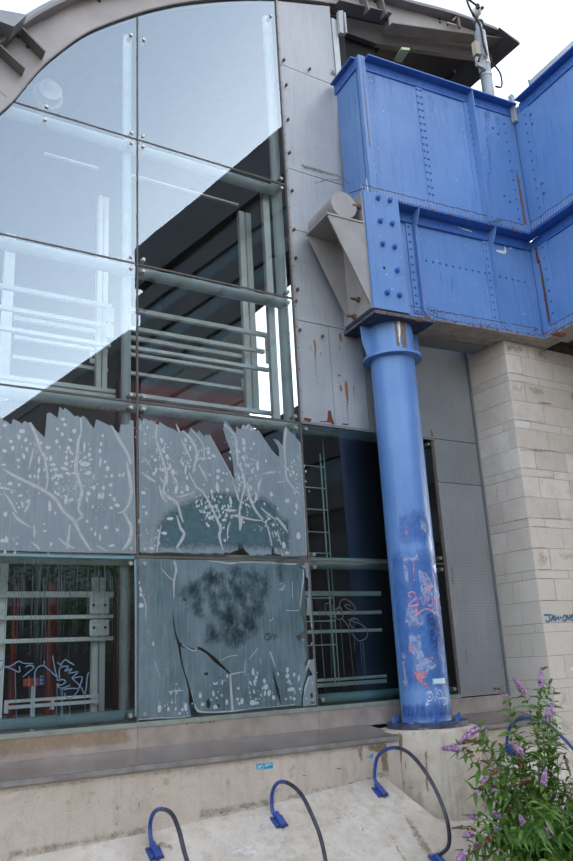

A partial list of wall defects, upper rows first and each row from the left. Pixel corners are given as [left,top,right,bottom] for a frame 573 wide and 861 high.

corrosion [394,315,430,348]